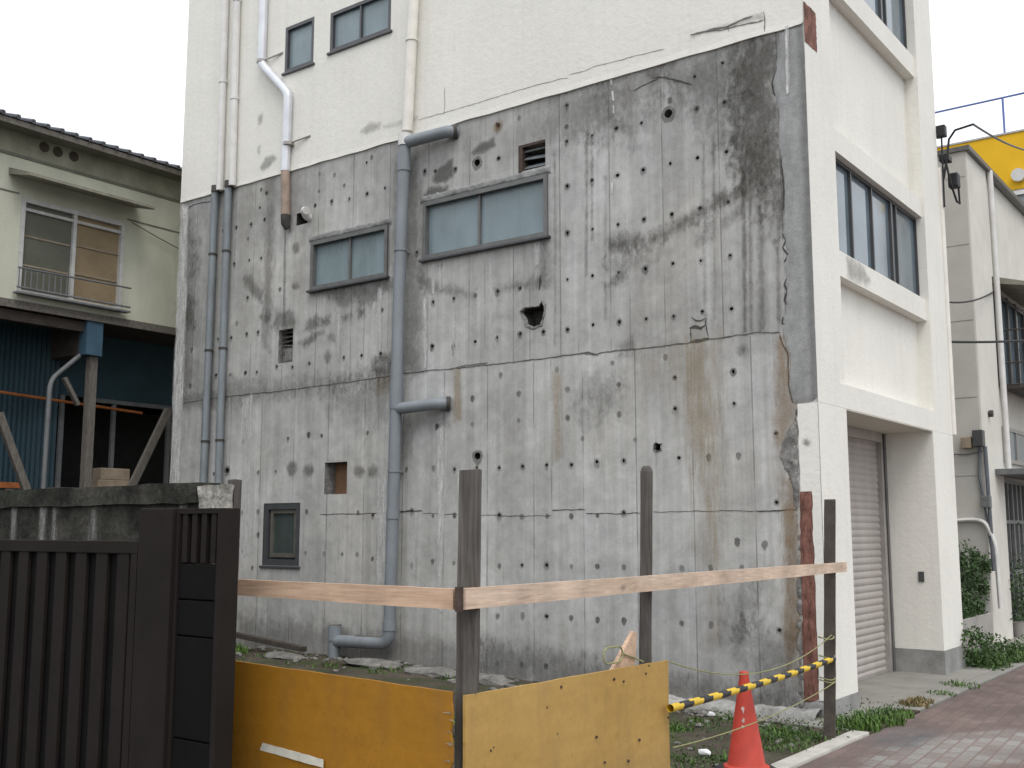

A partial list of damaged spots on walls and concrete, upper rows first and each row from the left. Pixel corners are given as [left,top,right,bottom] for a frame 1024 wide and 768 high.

crack [690,11,765,35]
crack [419,49,693,120]
water stain [718,26,789,211]
spalling [519,275,547,330]
crack [182,317,781,403]
peeling [780,318,819,709]